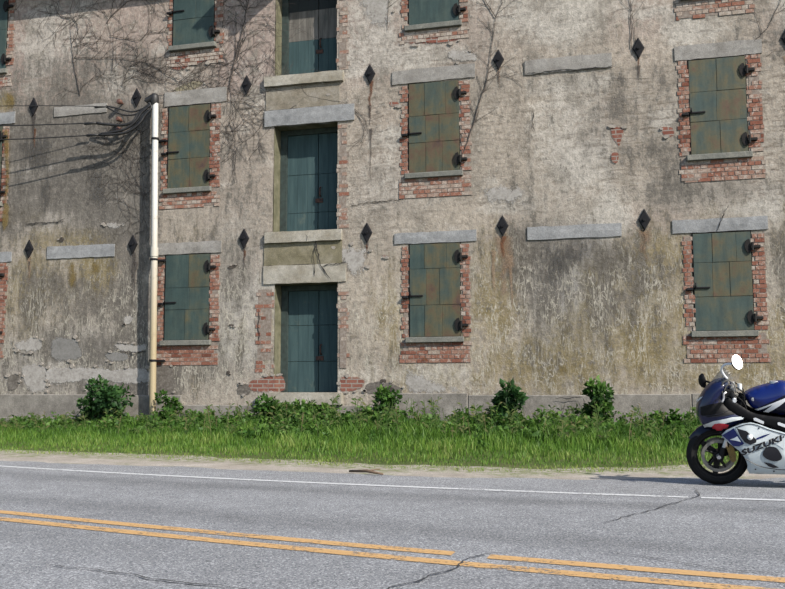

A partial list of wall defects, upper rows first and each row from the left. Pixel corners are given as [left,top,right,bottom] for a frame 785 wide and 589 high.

spalling [608,124,627,163]
crack [306,235,347,278]
peeling [13,336,44,354]
peeling [5,341,175,395]
spalling [237,373,286,397]